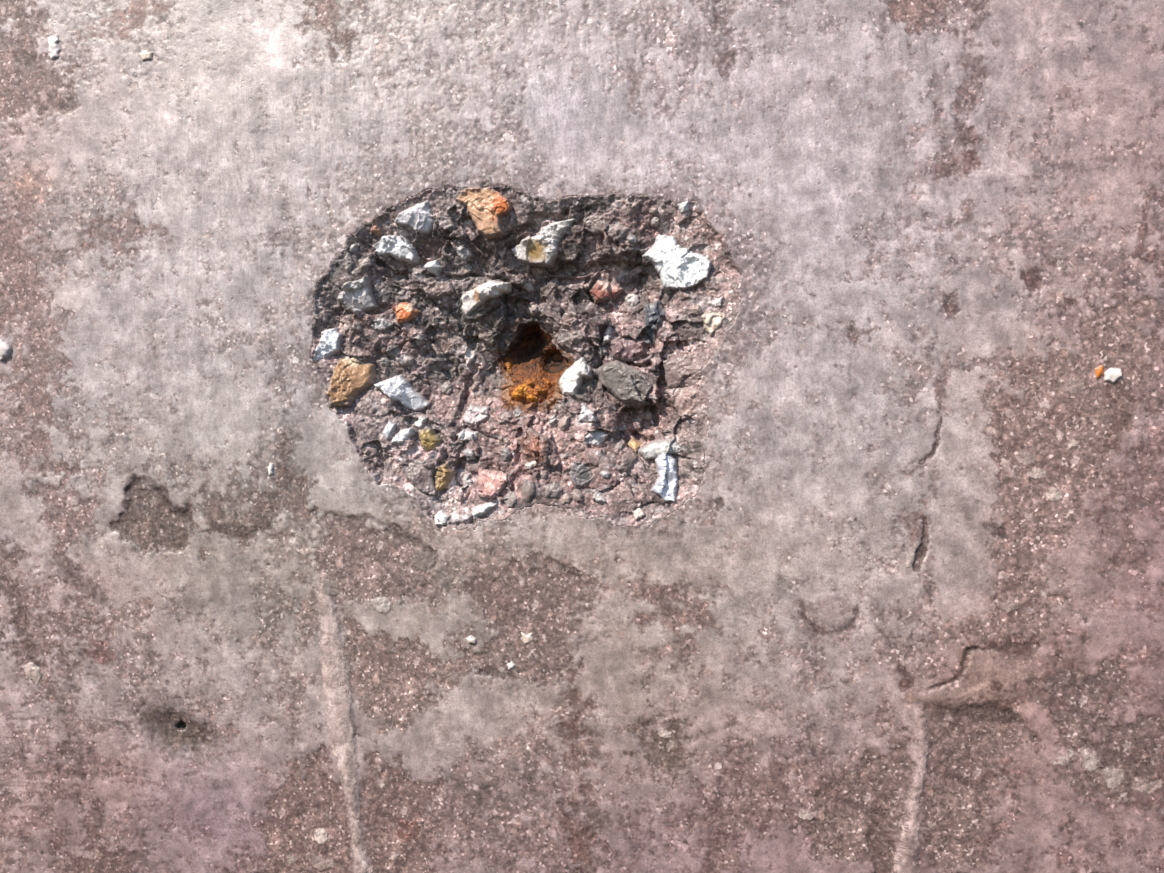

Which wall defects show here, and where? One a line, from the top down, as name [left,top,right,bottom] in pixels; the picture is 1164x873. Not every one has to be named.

spalling [310,181,742,531]
corrosion [498,324,574,413]
crack [919,419,942,464]
crack [905,518,929,572]